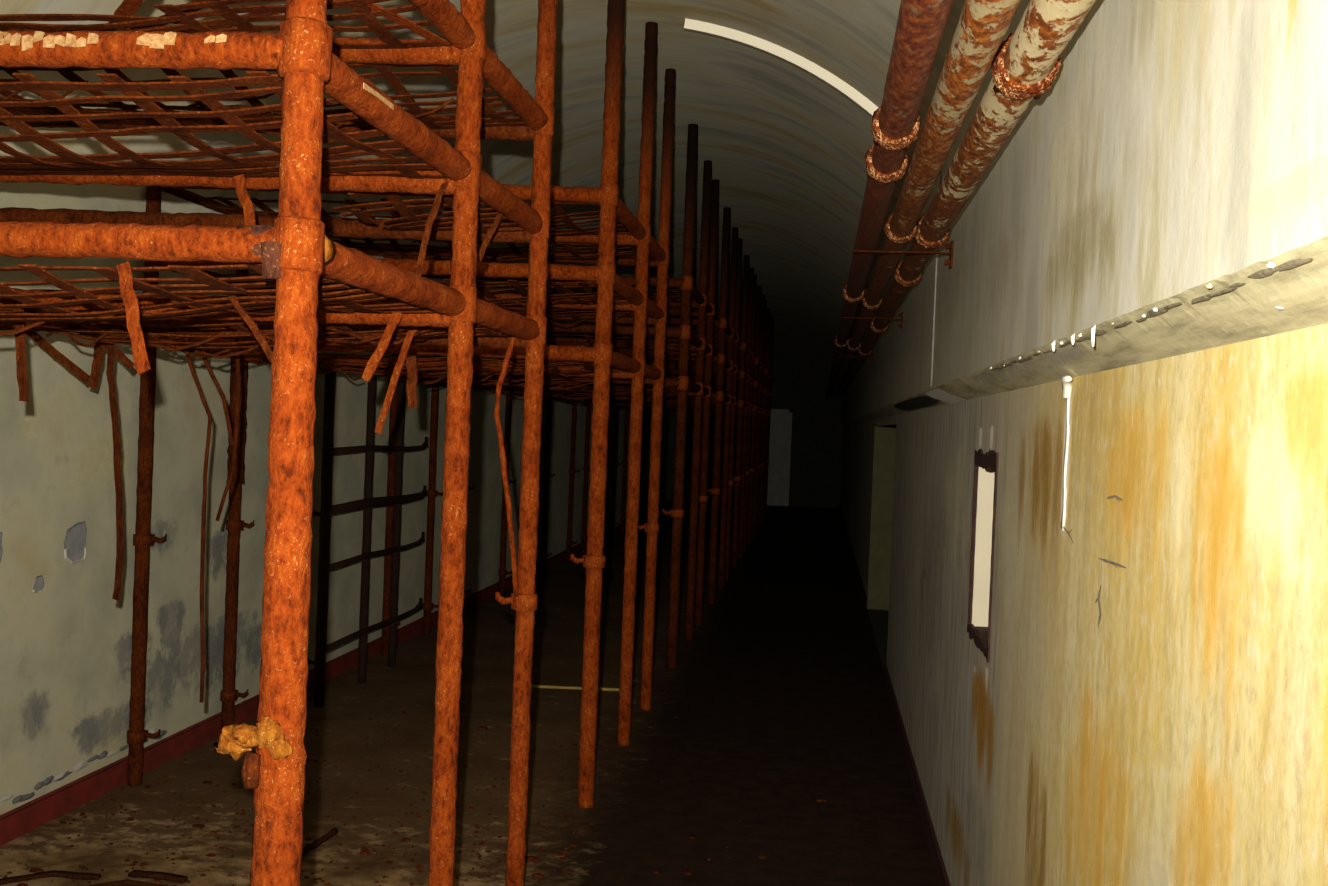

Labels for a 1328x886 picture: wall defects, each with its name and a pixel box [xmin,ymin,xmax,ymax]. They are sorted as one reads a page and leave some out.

leakage [894,396,939,410]
leakage [1061,375,1072,531]
peeling [64,520,87,564]
leakage [147,604,262,703]